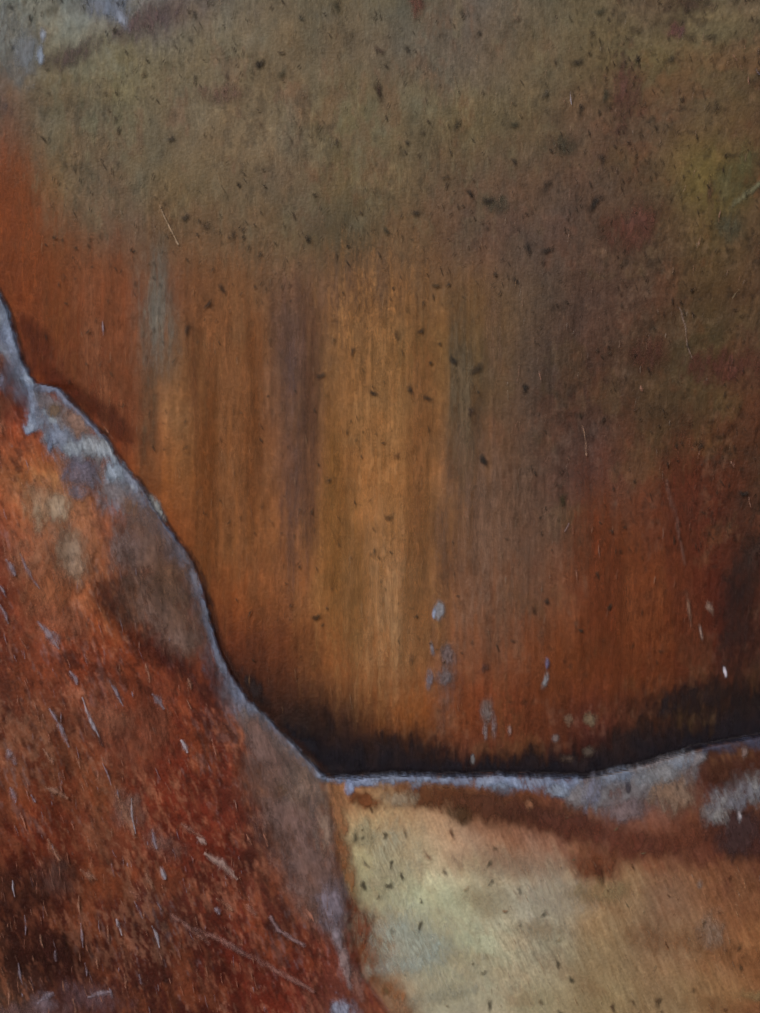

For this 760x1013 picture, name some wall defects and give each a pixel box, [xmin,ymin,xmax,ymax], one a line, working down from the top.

crack [0,290,24,359]
crack [47,385,107,437]
crack [120,457,177,539]
water stain [0,295,760,934]
crack [201,573,760,793]
corrosion [396,785,708,883]
corrosion [330,791,408,1013]